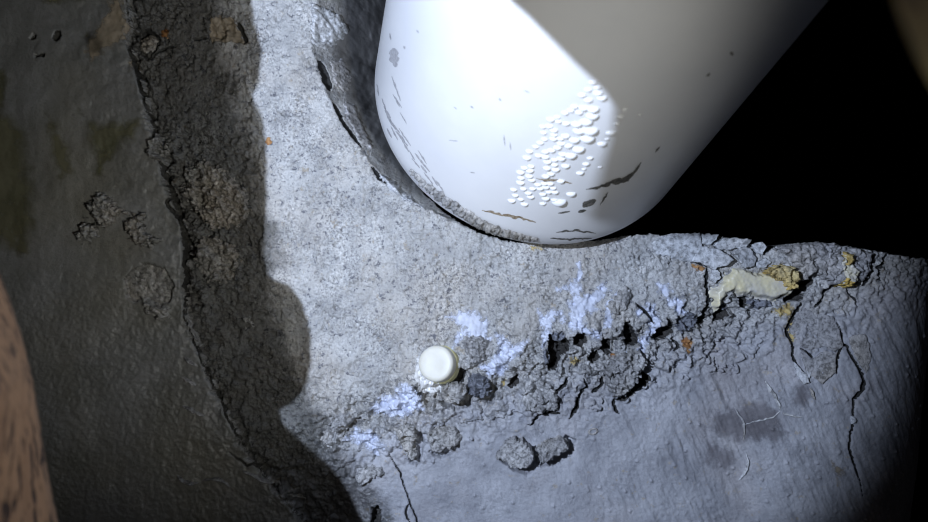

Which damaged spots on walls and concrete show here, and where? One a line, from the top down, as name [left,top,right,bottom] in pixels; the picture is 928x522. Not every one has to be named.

crack [159,159,305,522]
crack [389,456,418,522]
efflorescence [371,356,441,419]
spalling [422,335,497,411]
efflorescence [445,310,529,378]
spalling [496,435,569,469]
efflorescence [537,261,617,349]
spalling [543,283,651,401]
damp [625,302,662,353]
peeling [651,233,874,384]
crack [784,250,888,372]
crack [836,323,866,496]